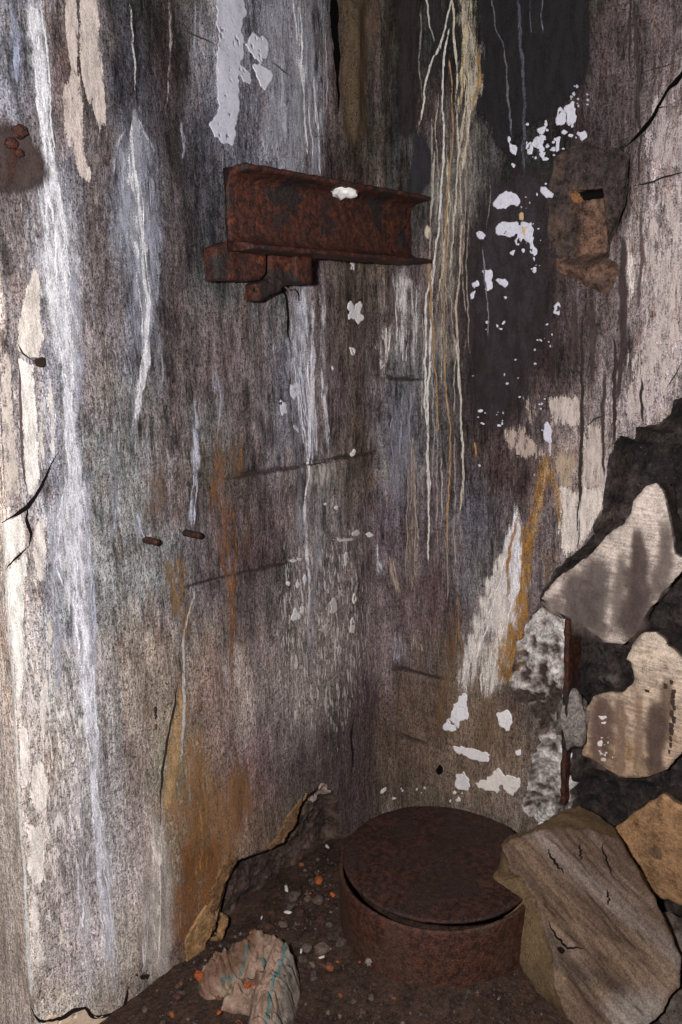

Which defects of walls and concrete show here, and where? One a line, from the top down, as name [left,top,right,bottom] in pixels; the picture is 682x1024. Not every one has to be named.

corrosion [0,126,48,193]
crack [620,60,682,149]
crack [635,172,682,186]
crack [2,343,59,569]
water stain [376,0,590,601]
spalling [449,85,682,827]
water stain [571,216,644,553]
corrosion [492,457,562,684]
corrosion [164,693,183,808]
spalling [184,783,345,962]
spalling [656,897,682,916]